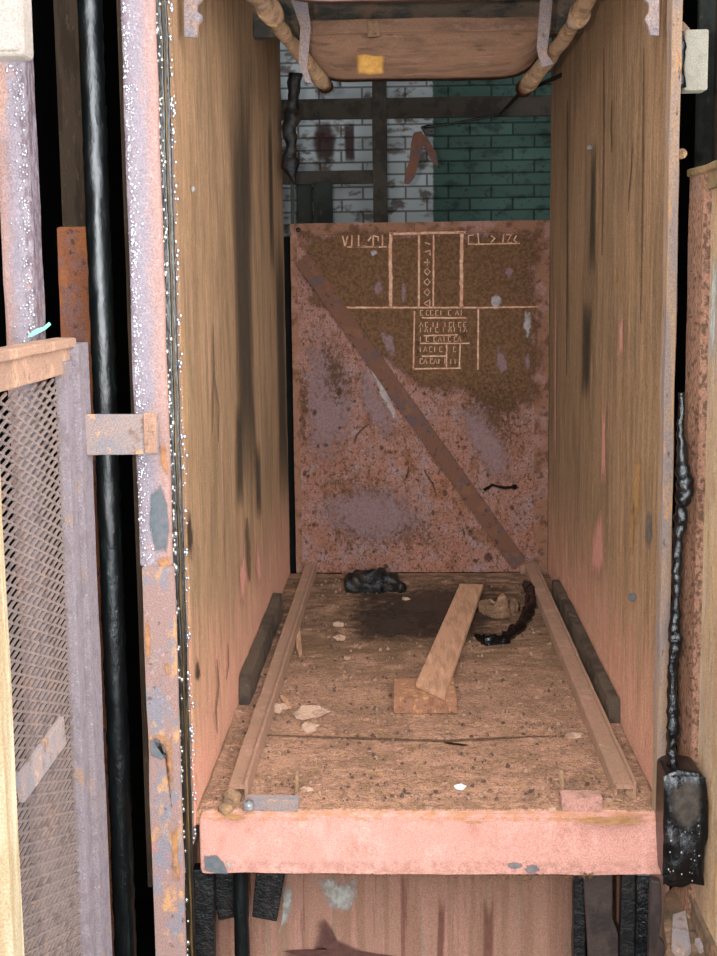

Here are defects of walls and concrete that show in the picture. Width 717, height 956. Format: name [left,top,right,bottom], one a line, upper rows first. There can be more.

rust [304,230,542,447]
rust [299,376,328,455]
rust [160,446,169,474]
rust [312,462,439,555]
rust [157,736,172,806]
rust [171,829,180,879]